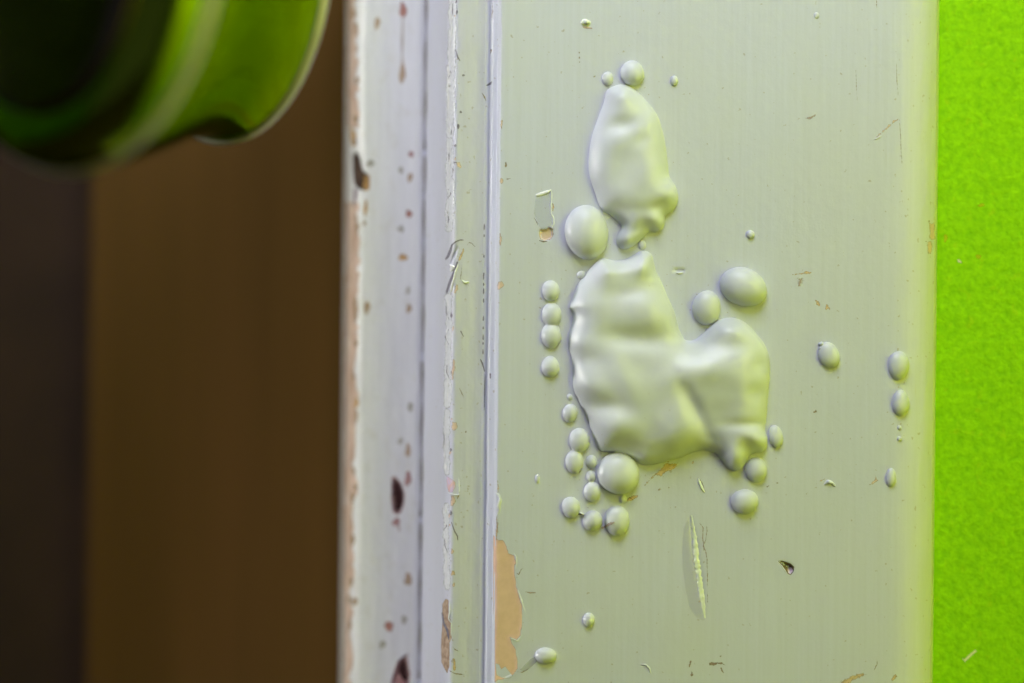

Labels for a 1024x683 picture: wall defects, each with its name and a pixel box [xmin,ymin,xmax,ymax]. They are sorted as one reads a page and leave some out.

peeling [535,190,554,242]
peeling [493,481,525,682]